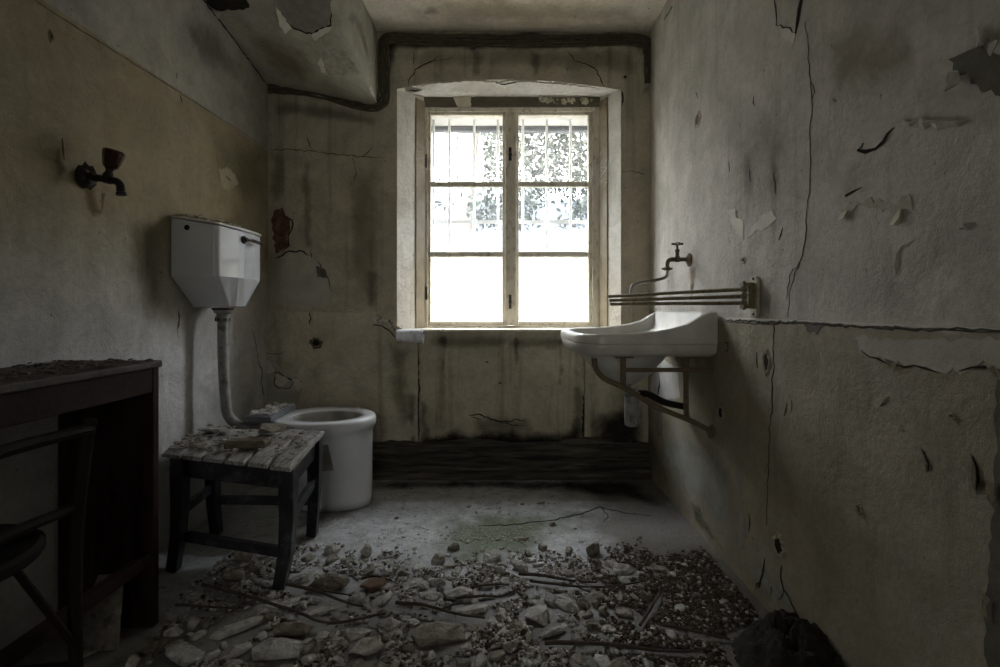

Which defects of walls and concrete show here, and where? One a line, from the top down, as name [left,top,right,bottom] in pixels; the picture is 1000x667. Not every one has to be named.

peeling [206,0,249,18]
peeling [273,0,332,41]
peeling [945,27,1000,96]
crack [857,128,894,154]
crack [275,138,383,180]
crack [748,0,815,619]
crack [470,413,523,426]
leakage [428,428,579,443]
leakage [597,411,641,442]
peeling [726,319,1000,667]
crack [478,506,652,526]